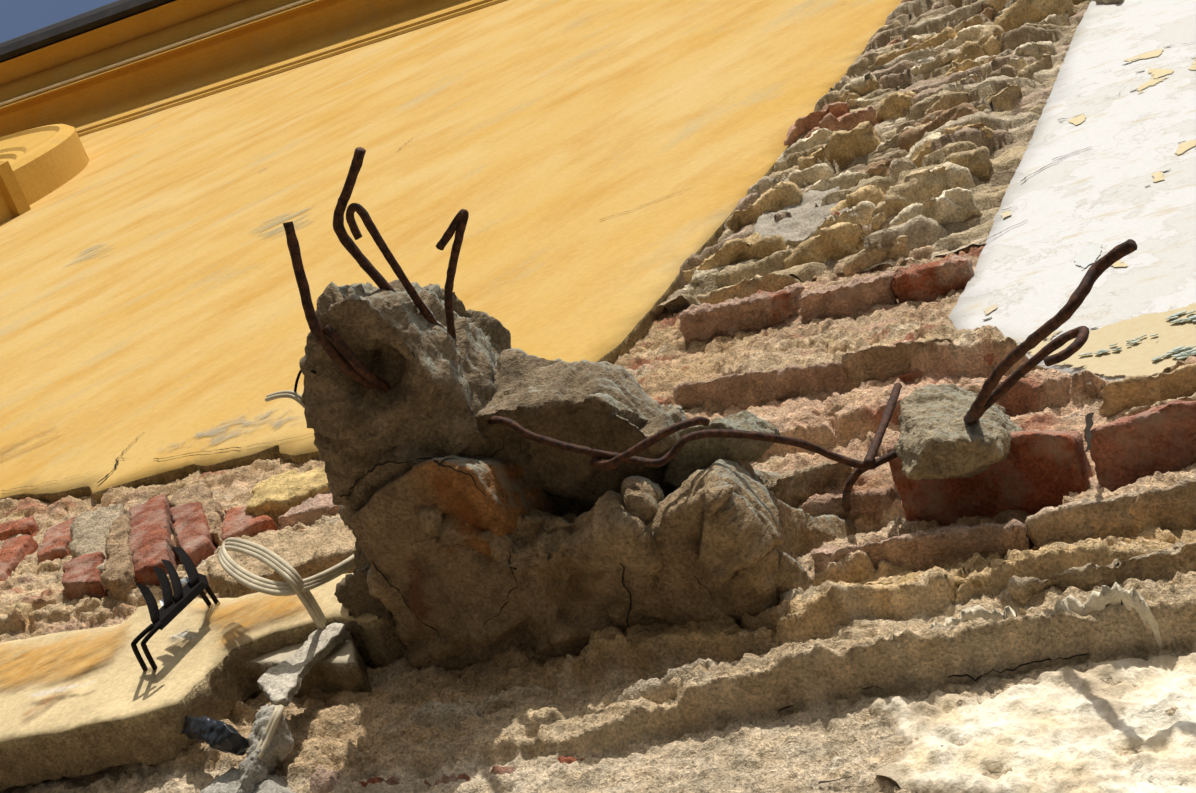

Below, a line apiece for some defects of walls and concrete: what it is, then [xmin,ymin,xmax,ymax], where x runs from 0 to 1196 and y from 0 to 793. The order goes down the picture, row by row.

flaking render [270,0,1196,793]
spalling [0,456,356,696]
flaking render [0,692,271,793]